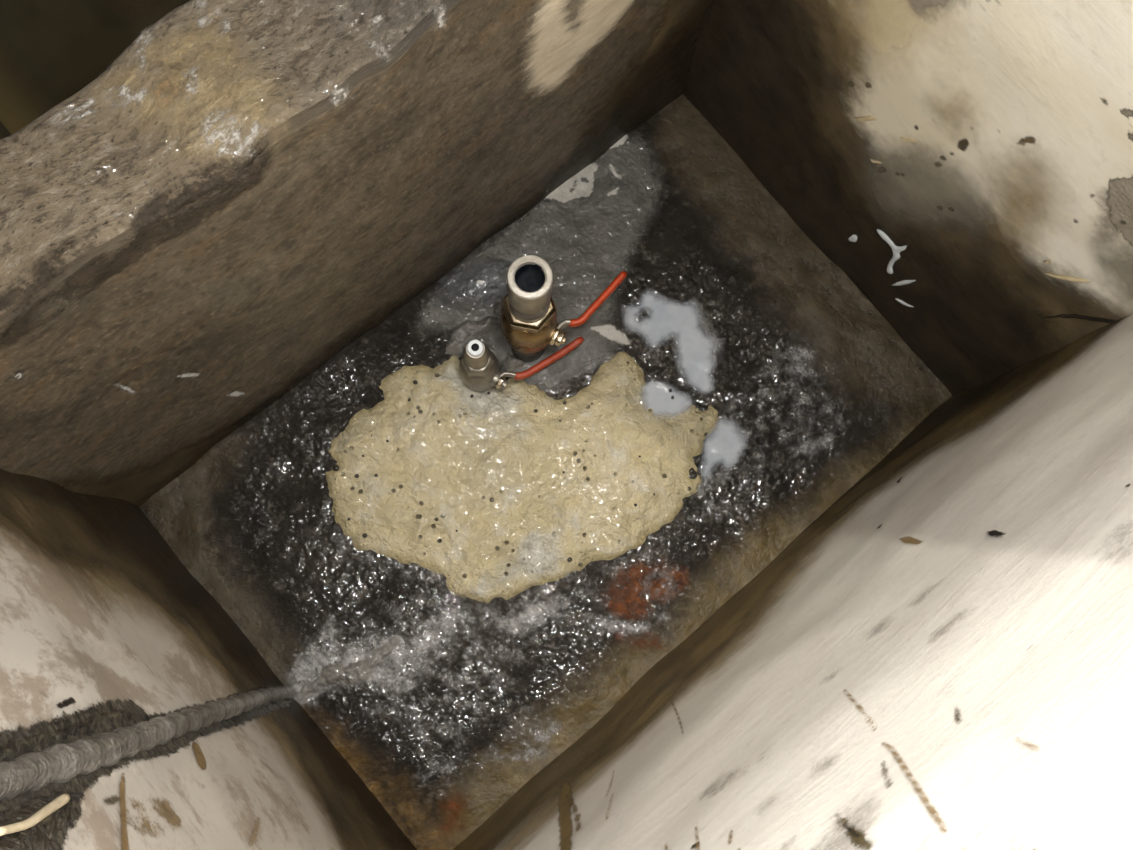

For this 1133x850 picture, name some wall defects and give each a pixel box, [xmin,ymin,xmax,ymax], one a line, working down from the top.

peeling [525,0,633,94]
peeling [910,0,948,14]
peeling [1101,177,1133,299]
water stain [0,0,713,692]
water stain [447,0,1129,850]
rust [589,563,687,648]
water stain [258,611,459,850]